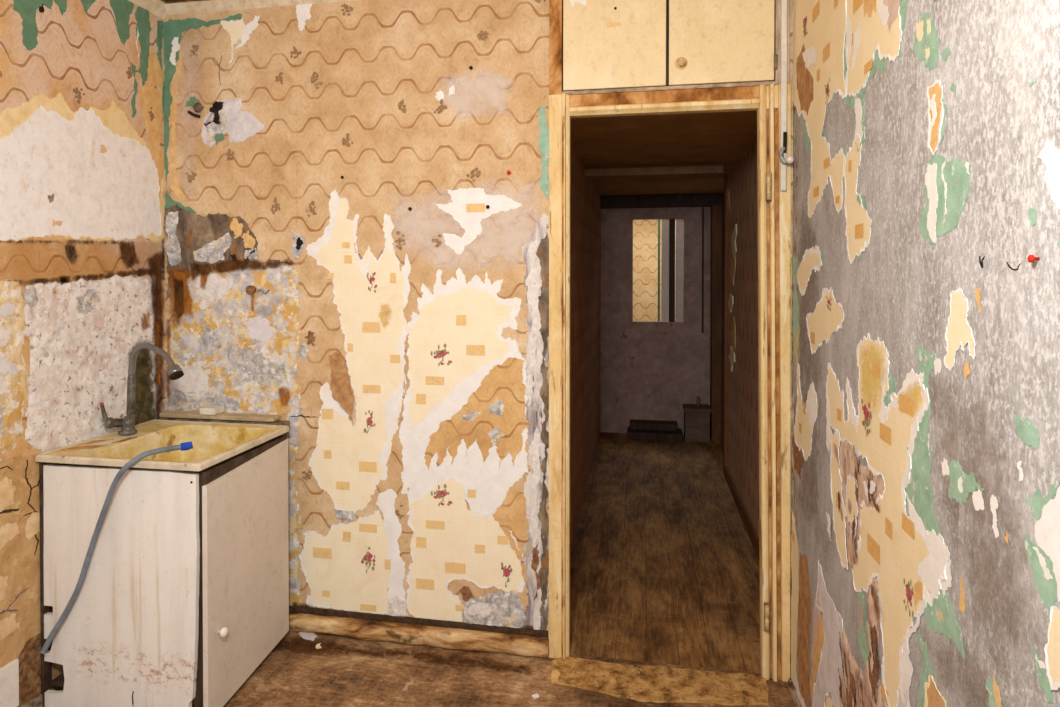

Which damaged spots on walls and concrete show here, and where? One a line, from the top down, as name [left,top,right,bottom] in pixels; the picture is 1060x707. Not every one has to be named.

peeling [796,44,813,160]
peeling [823,128,872,264]
peeling [844,0,951,109]
peeling [919,83,970,245]
spalling [0,0,314,707]
peeling [387,105,549,631]
crack [0,459,39,555]
peeling [792,435,803,479]
peeling [905,347,1009,544]
crack [0,588,28,615]
peeling [917,559,966,707]
peeling [1024,530,1058,621]